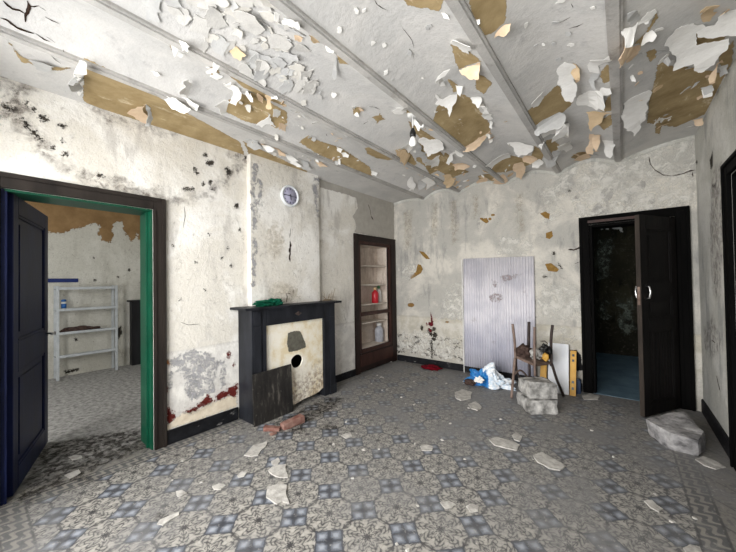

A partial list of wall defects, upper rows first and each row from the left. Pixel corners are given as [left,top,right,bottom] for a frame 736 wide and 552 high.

crack [1,1,64,62]
damp [0,85,69,157]
peeling [9,0,736,229]
peeling [25,201,140,243]
spalling [402,251,430,279]
damp [397,322,462,361]
spalling [167,349,238,431]